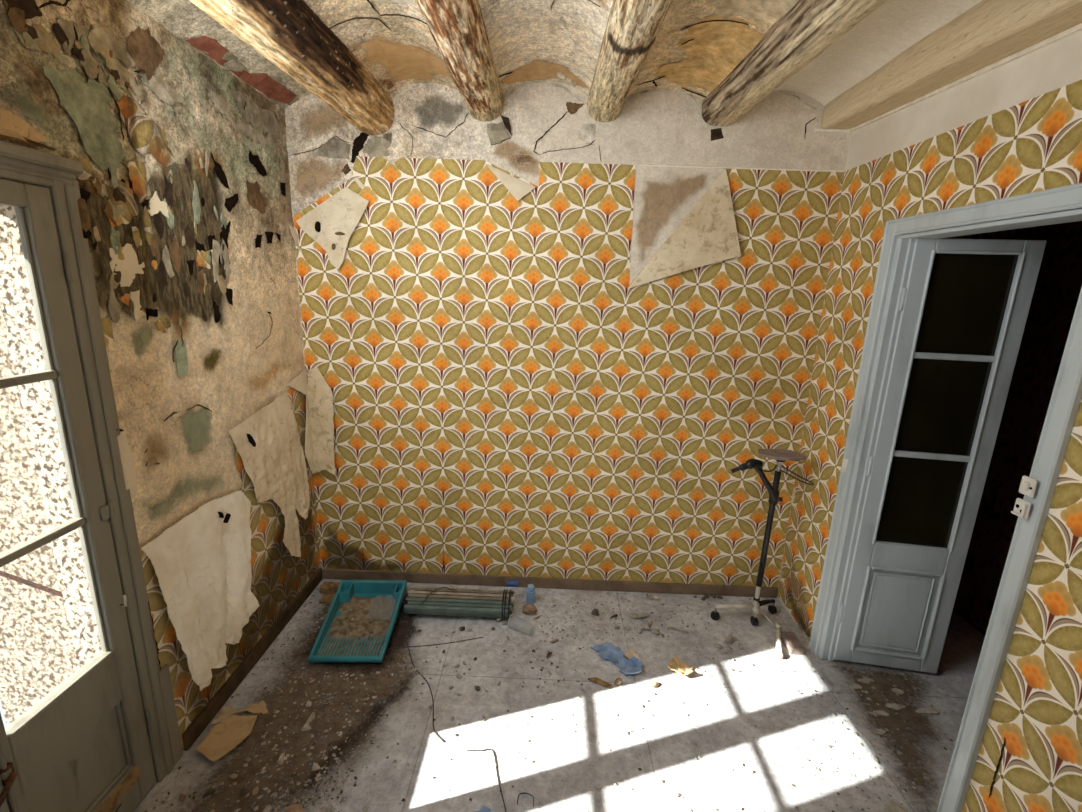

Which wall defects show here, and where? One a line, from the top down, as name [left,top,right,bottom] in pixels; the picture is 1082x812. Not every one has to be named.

crack [329,0,427,32]
peeling [0,0,185,170]
flaking render [182,34,299,150]